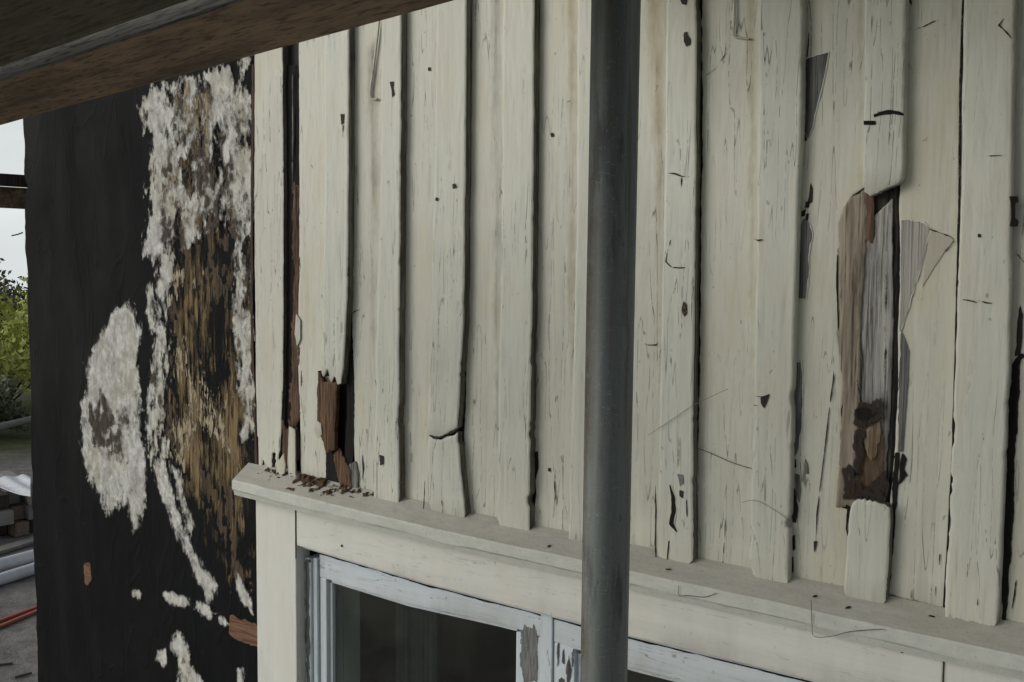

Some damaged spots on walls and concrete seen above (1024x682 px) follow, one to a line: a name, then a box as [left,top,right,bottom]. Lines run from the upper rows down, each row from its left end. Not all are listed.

peeling [804,33,830,141]
water stain [160,80,250,252]
peeling [799,184,814,300]
peeling [898,219,954,484]
water stain [88,389,137,464]
peeling [276,426,296,476]
peeling [314,421,322,438]
crack [430,359,467,445]
peeling [668,474,684,533]
peeling [520,624,538,682]